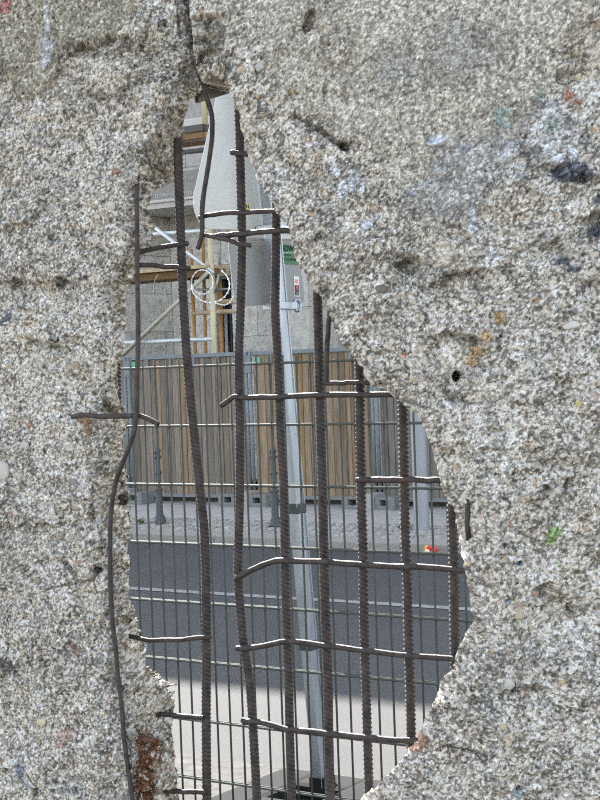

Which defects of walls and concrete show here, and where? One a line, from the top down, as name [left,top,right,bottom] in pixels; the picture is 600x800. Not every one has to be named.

crack [174,0,182,39]
peeling [426,135,447,145]
peeling [331,163,365,199]
peeling [361,219,374,231]
peeling [468,200,476,235]
spalling [399,255,489,300]
spalling [425,329,514,404]
rust [132,731,163,800]